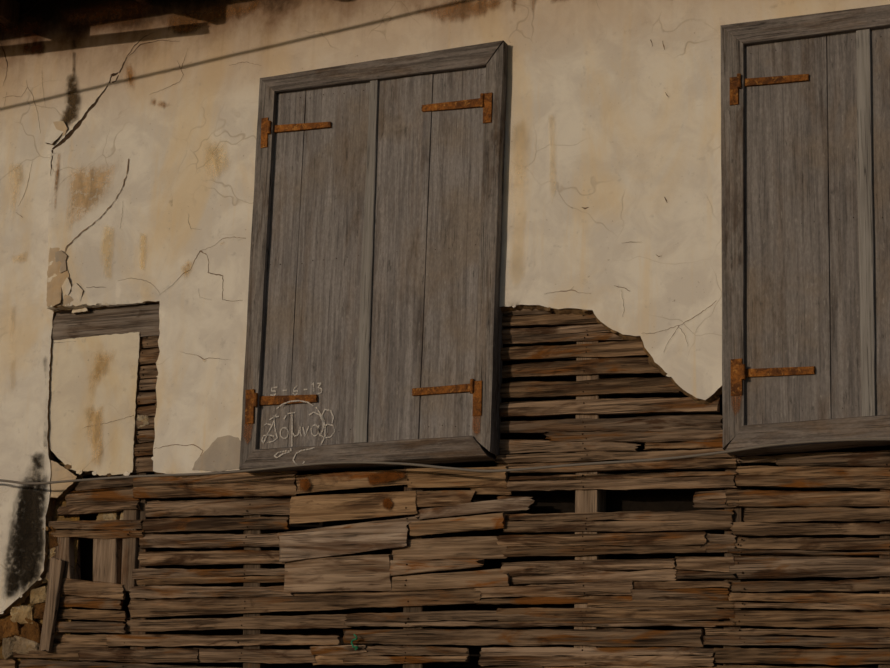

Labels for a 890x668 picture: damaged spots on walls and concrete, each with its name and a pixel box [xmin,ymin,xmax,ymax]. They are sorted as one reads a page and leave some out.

leakage [0,16,44,54]
leakage [64,0,145,26]
leakage [169,2,258,33]
leakage [437,0,499,19]
leakage [62,40,80,124]
crack [0,31,194,219]
crack [86,214,246,303]
spalling [501,305,717,405]
spalling [64,464,136,477]
flaking render [154,435,241,478]
leakage [6,445,45,596]
spalling [0,517,52,617]